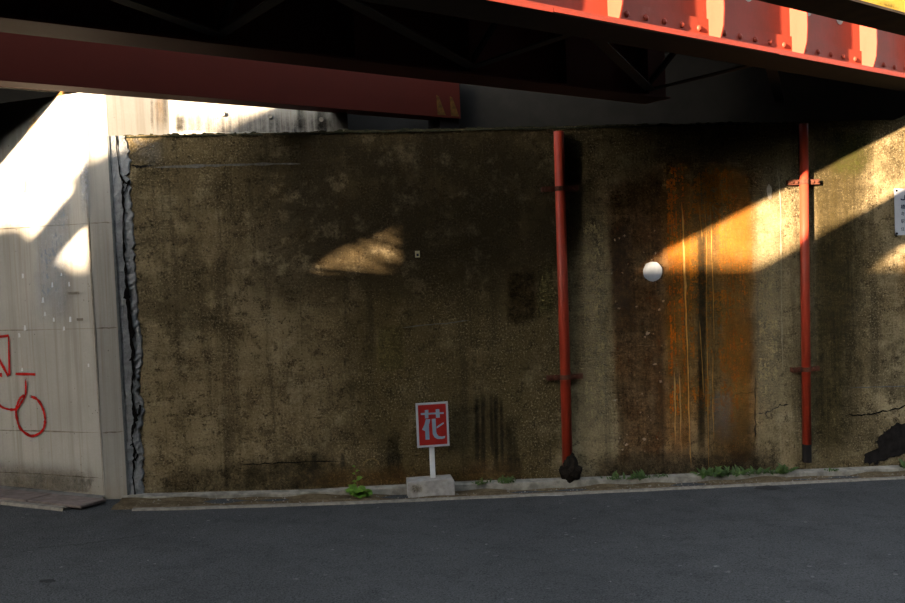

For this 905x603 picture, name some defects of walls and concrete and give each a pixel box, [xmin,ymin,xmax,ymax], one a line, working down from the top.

crack [115,136,152,495]
rust [664,163,752,455]
crack [848,405,905,417]
peeling [864,423,905,465]